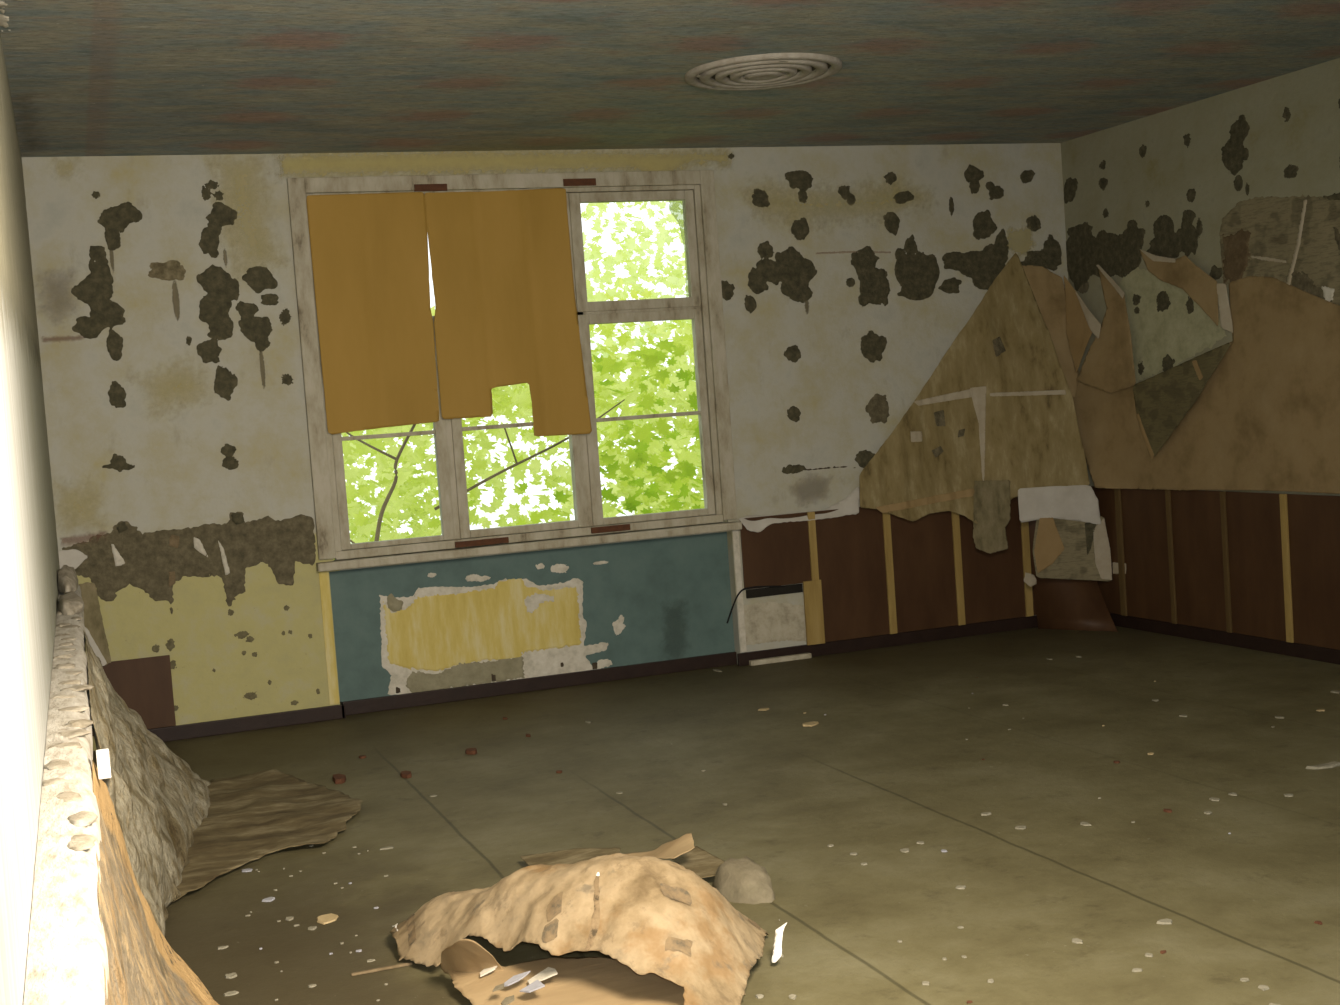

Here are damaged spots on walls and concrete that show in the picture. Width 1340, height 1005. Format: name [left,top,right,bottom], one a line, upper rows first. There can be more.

spalling [1221,115,1250,196]
spalling [71,191,142,361]
spalling [148,180,291,401]
peeling [846,160,1227,383]
peeling [1322,286,1334,302]
spalling [108,381,126,408]
spalling [865,393,890,424]
spalling [102,453,135,472]
spalling [221,444,239,470]
spalling [855,450,875,468]
spalling [62,512,316,616]
peeling [379,563,626,695]